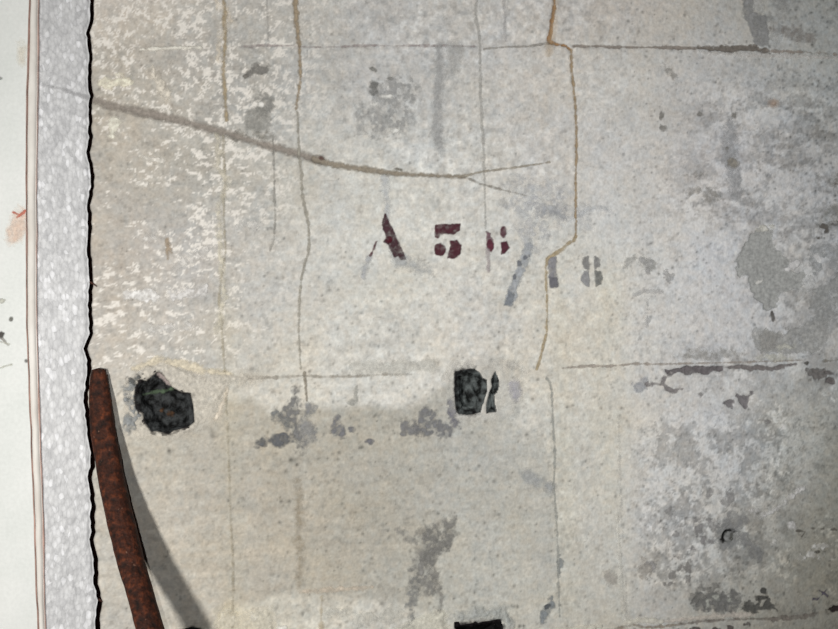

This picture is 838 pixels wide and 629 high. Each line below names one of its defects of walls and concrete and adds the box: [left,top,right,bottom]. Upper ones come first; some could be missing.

corrosion [89,368,165,629]
crack [51,0,550,629]
crack [536,0,578,617]